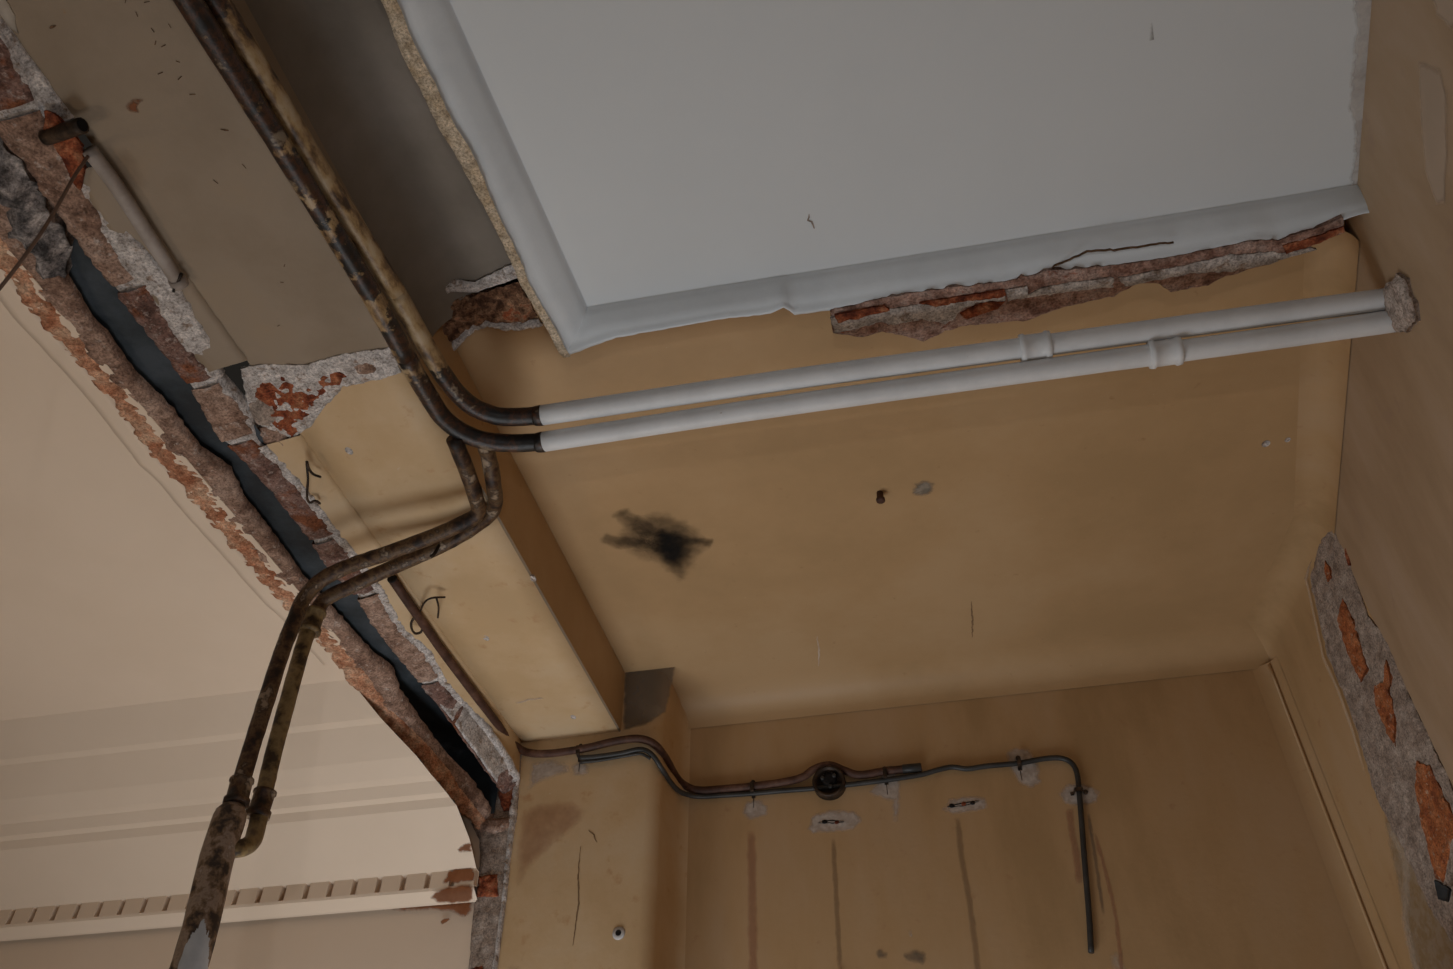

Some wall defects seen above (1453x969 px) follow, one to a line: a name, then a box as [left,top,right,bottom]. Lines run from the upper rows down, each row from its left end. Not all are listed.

flaking render [381,0,570,358]
spalling [830,214,1345,342]
spalling [0,238,295,611]
spalling [255,372,347,438]
spalling [316,626,486,830]
flaking render [1337,598,1397,747]
flaking render [1415,761,1453,882]